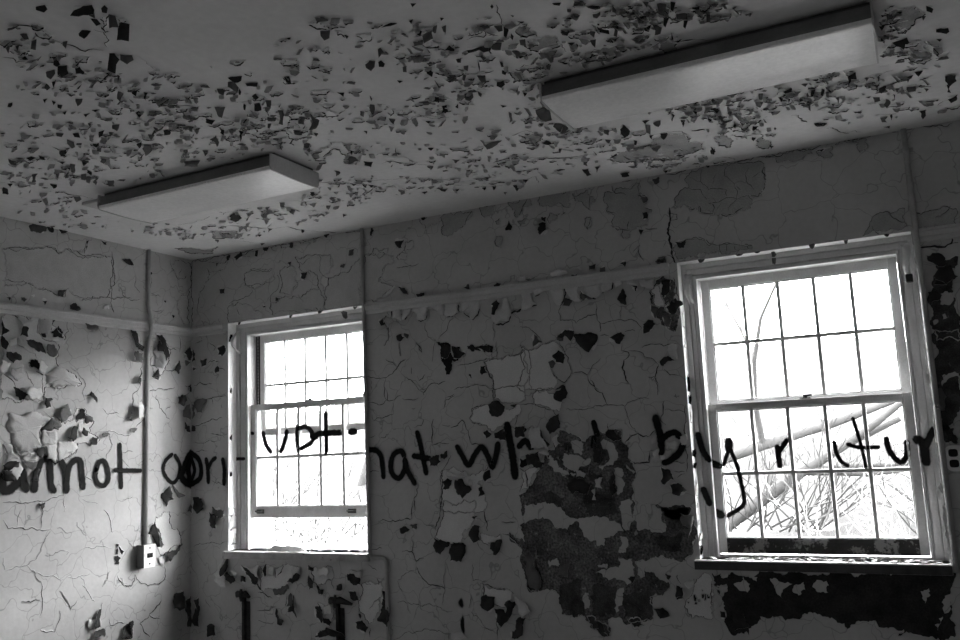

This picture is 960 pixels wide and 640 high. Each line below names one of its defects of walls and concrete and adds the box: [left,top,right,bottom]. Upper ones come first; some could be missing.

peeling [0,0,960,328]
crack [662,208,678,264]
peeling [0,314,110,482]
crack [2,320,141,633]
peeling [129,330,233,434]
crack [149,337,225,453]
spalling [378,275,958,640]
spalling [912,244,960,470]
peeling [214,559,390,640]